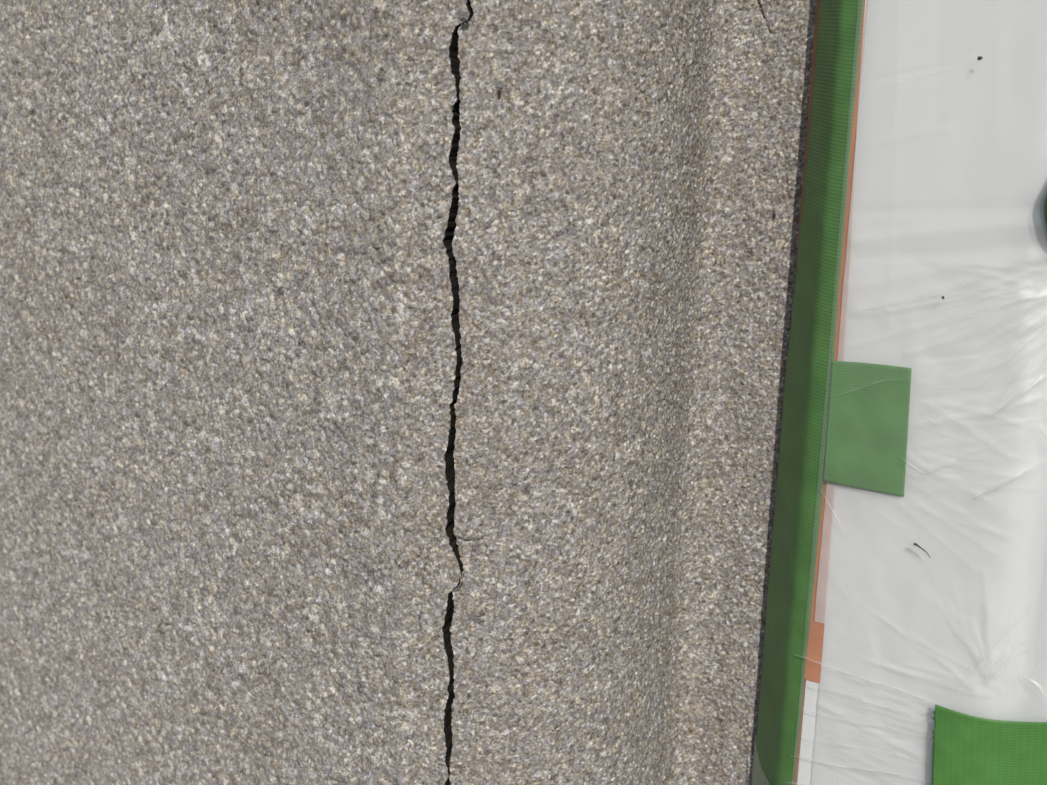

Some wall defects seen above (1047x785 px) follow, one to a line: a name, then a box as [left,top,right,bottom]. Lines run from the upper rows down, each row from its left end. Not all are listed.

crack [422,0,480,785]